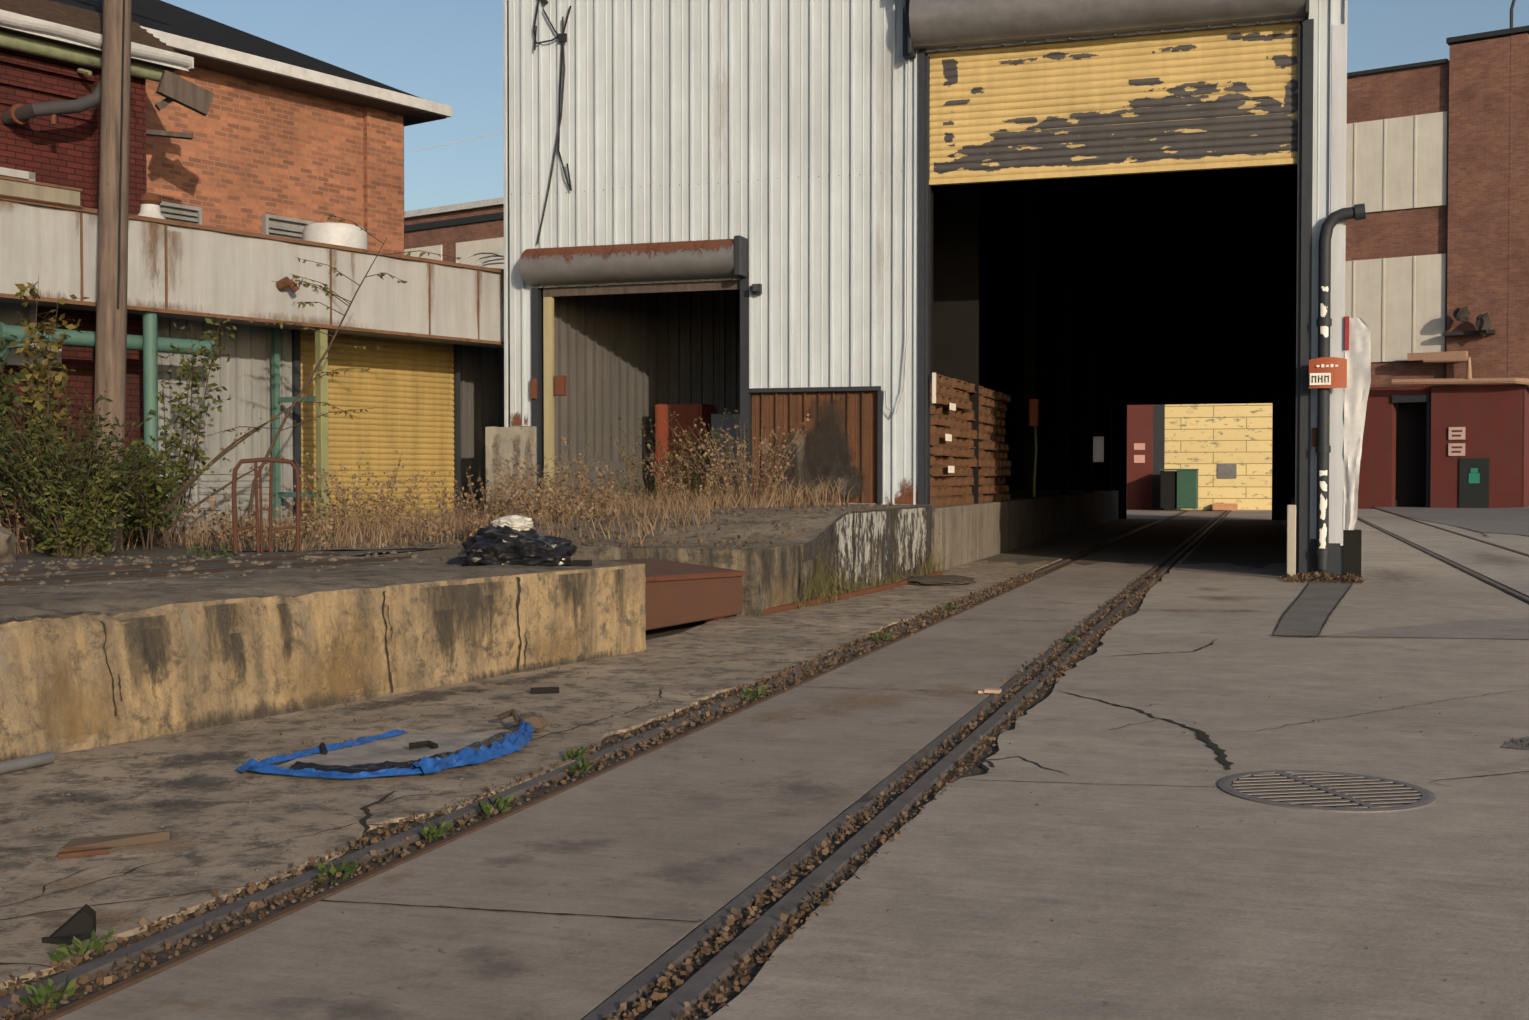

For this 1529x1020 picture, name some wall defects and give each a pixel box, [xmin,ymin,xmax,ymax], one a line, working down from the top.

peeling [934,32,1298,174]
corrosion [521,239,734,267]
leakage [122,615,169,674]
leakage [207,603,246,677]
leakage [279,603,292,649]
leakage [320,645,567,711]
crack [1091,639,1216,658]
crack [1061,689,1527,770]
leakage [144,752,241,808]
crack [963,756,1067,774]
crack [0,791,428,920]
crack [0,961,52,969]